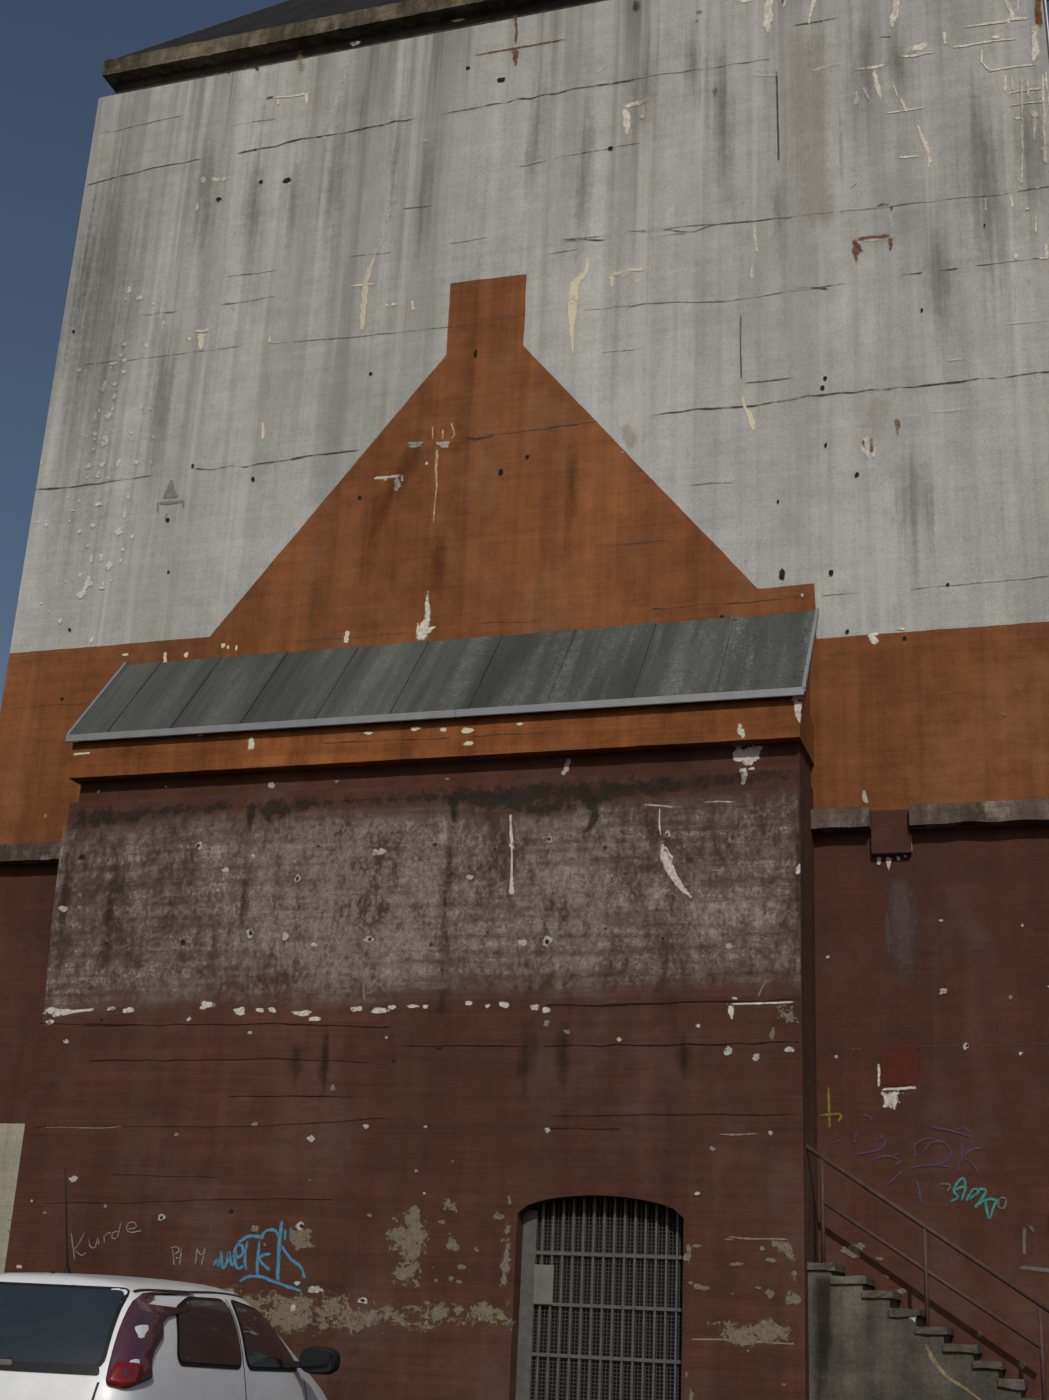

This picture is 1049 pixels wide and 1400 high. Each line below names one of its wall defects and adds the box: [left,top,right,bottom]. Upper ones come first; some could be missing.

corrosion [477,16,564,65]
corrosion [1035,0,1043,26]
crack [240,119,410,153]
crack [448,59,780,159]
water stain [854,64,933,168]
water stain [900,0,1049,259]
corrosion [852,234,893,260]
crack [590,285,1049,414]
spalling [726,724,763,784]
water stain [46,770,801,1005]
spalling [877,1065,915,1109]
peeling [202,1192,515,1338]